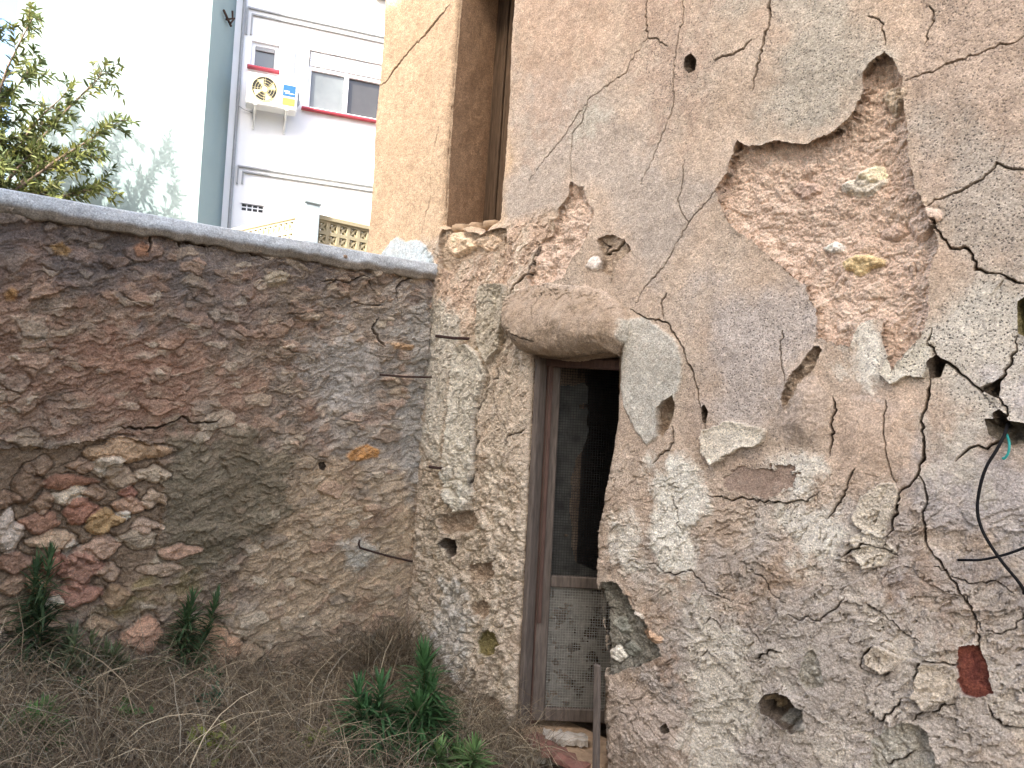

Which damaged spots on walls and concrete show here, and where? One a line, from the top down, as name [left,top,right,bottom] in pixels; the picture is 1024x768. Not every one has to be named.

crack [713,0,772,92]
spalling [437,227,510,272]
spalling [525,181,632,286]
crack [629,159,726,434]
spalling [715,51,945,407]
crack [925,161,1024,286]
peeling [436,283,508,535]
peeling [698,420,801,500]
crack [706,396,856,521]
crack [840,327,1024,646]
spalling [598,581,664,676]
crack [745,566,959,724]